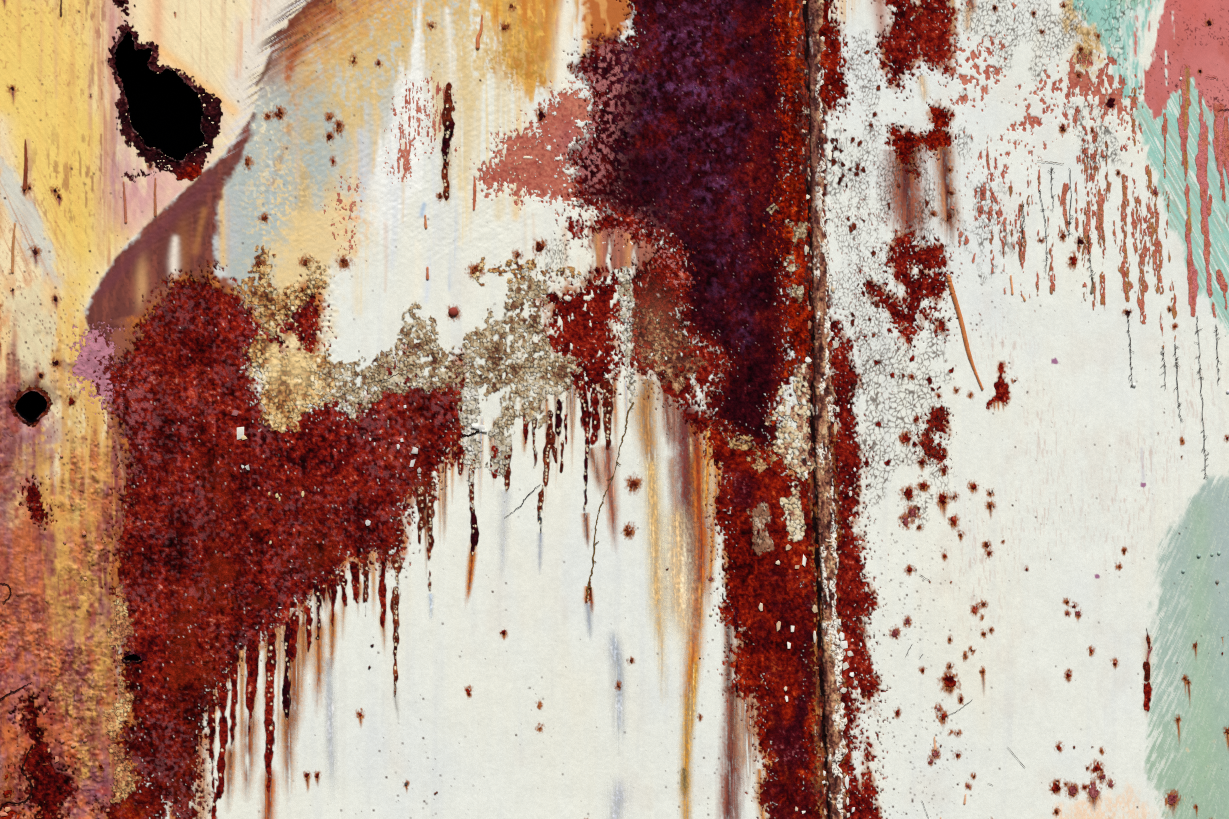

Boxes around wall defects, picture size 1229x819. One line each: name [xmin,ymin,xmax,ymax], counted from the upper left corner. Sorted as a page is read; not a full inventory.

corrosion [854,0,976,352]
peeling [988,64,1229,348]
peeling [234,245,583,486]
corrosion [91,0,912,819]
corrosion [17,475,59,531]
corrosion [971,600,994,637]
corrosion [939,646,975,704]
corrosion [0,687,78,819]
corrosion [928,704,961,766]
corrosion [1050,746,1113,815]
corrosion [1165,790,1181,809]